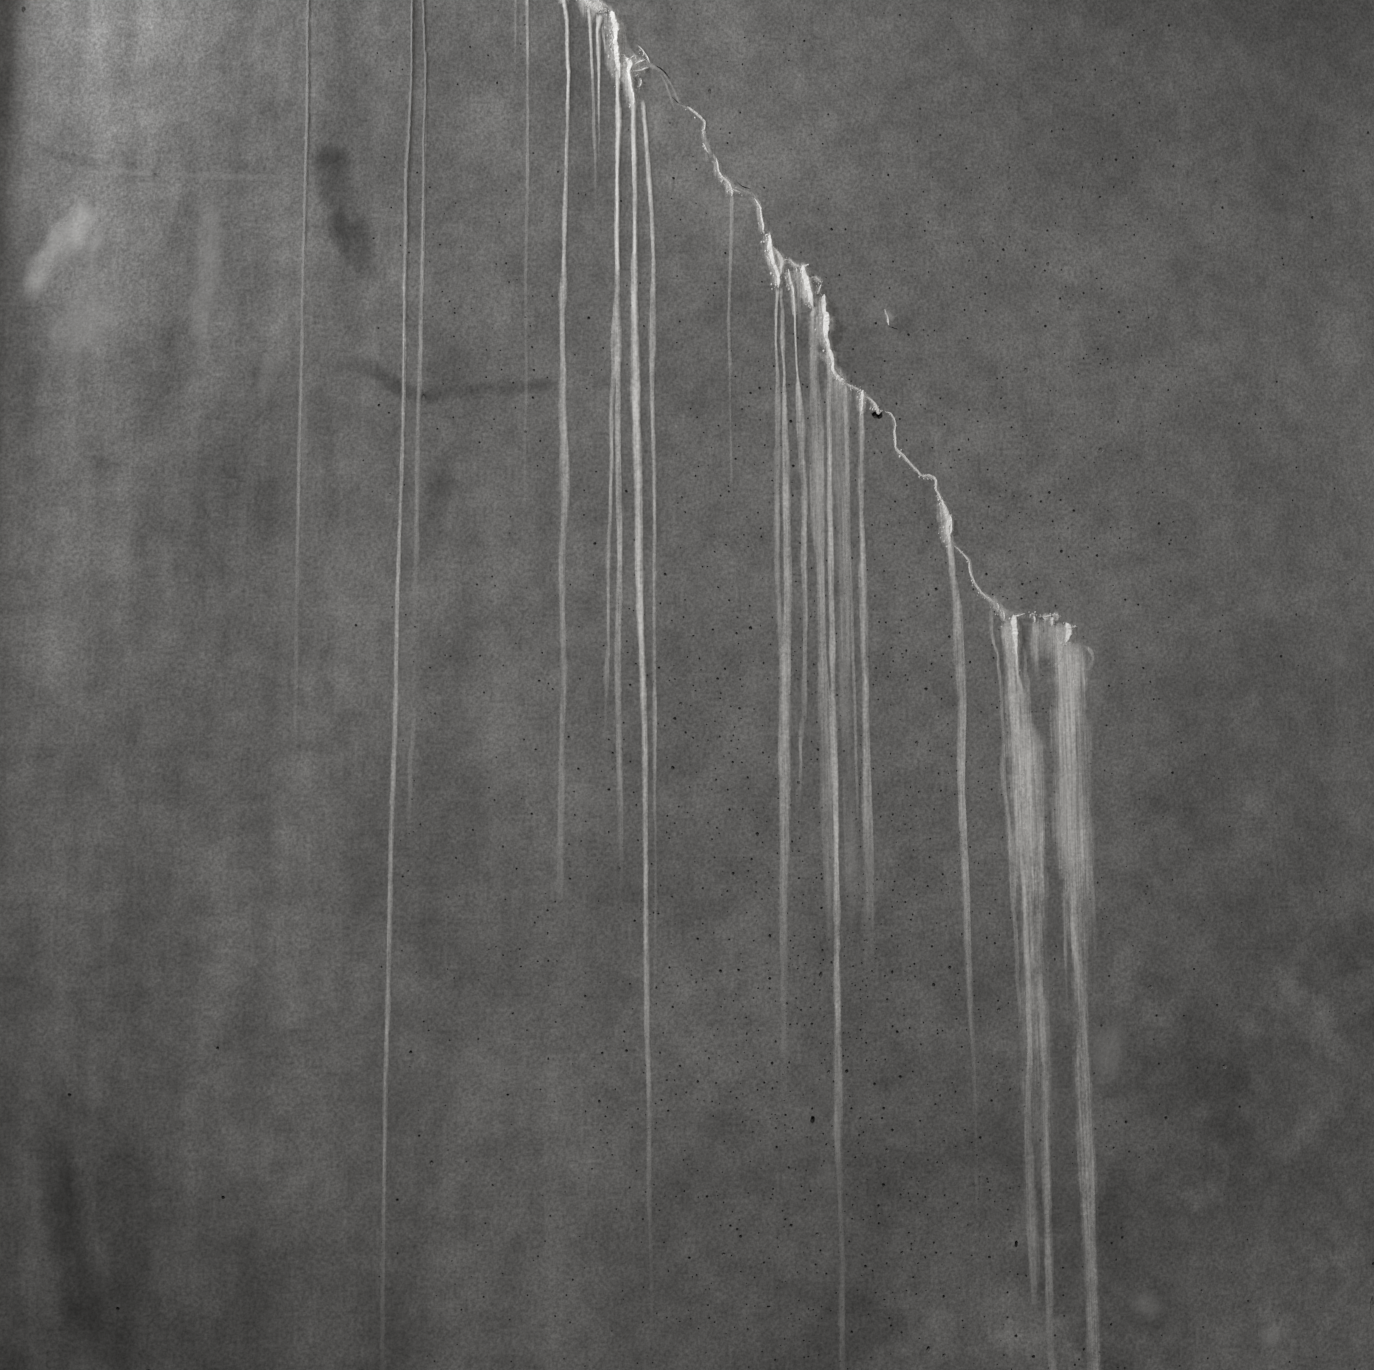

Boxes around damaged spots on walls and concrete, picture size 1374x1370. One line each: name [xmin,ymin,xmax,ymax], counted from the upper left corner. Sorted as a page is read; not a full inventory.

damp [384,274,421,1084]
damp [560,0,570,576]
damp [587,8,657,1036]
crack [560,0,1077,671]
damp [775,291,871,1034]
damp [992,621,1093,1054]
damp [1077,1020,1096,1278]